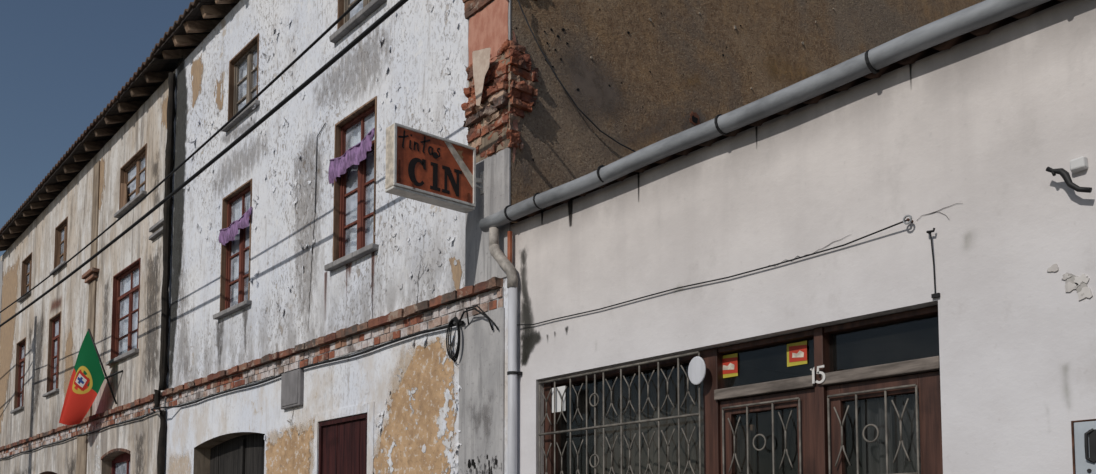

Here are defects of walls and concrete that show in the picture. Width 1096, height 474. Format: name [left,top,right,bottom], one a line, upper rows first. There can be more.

flaking render [187,53,223,161]
spalling [422,0,569,163]
damp [521,250,568,365]
spalling [1047,264,1093,301]
flaking render [264,419,314,474]
flaking render [372,335,498,474]